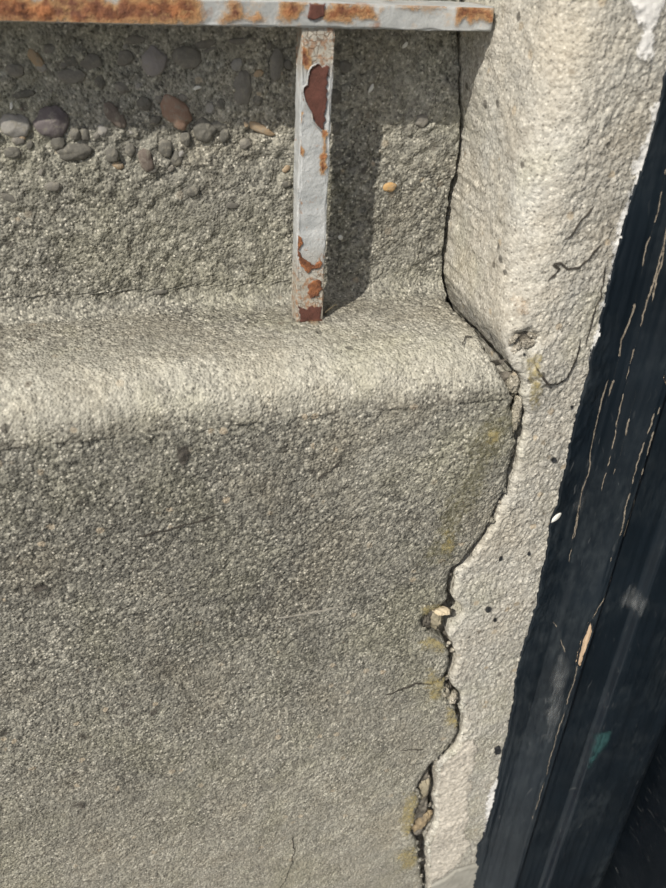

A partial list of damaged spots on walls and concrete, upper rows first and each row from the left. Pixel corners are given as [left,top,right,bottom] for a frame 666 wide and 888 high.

rust [0,0,202,25]
rust [218,0,262,25]
rust [277,1,315,22]
rust [324,3,377,22]
rust [389,0,493,25]
rust [301,46,329,175]
rust [297,236,322,322]
crack [462,244,606,457]
crack [489,487,507,523]
crack [386,565,467,888]